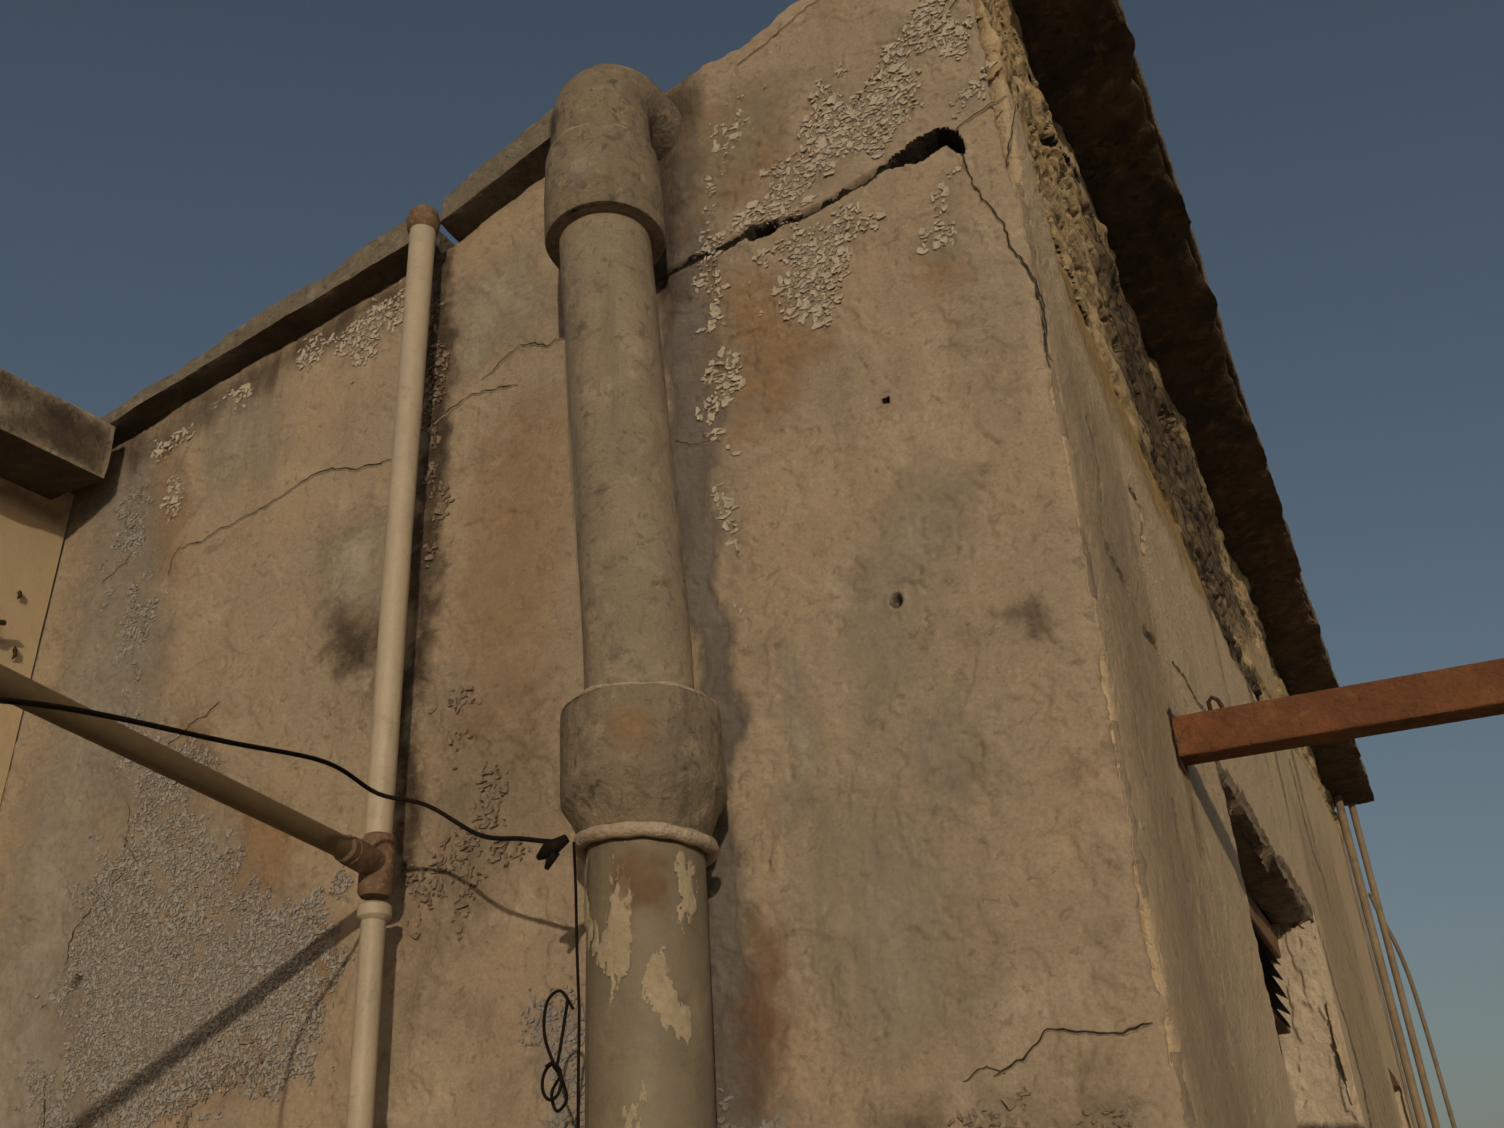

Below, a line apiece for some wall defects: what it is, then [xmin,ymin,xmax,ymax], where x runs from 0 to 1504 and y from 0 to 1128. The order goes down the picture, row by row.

crack [661,27,1101,362]
peeling [92,474,221,771]
crack [168,459,391,575]
water stain [325,516,386,605]
crack [420,338,565,433]
water stain [653,134,749,786]
peeling [13,752,356,1128]
peeling [518,985,585,1128]
peeling [584,840,691,1045]
peeling [674,850,698,934]
water stain [706,821,769,1128]
crack [963,1022,1153,1082]